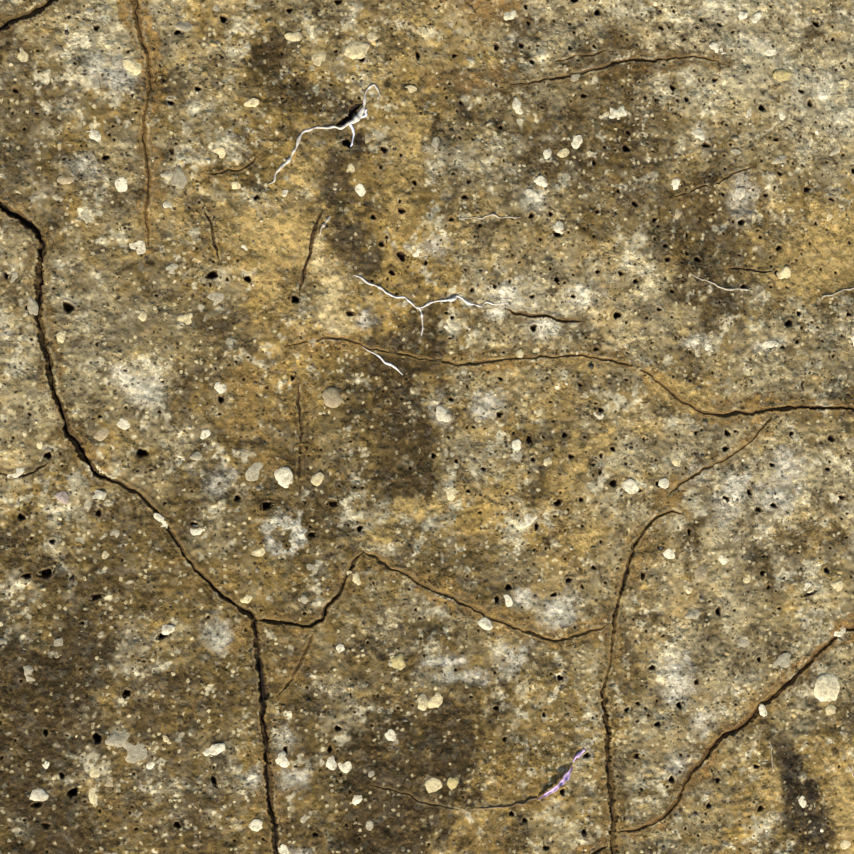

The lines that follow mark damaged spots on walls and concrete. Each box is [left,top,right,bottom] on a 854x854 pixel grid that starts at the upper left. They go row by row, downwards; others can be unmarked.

crack [0,0,70,38]
crack [117,0,169,255]
crack [330,100,363,131]
crack [193,151,262,265]
crack [0,186,854,854]